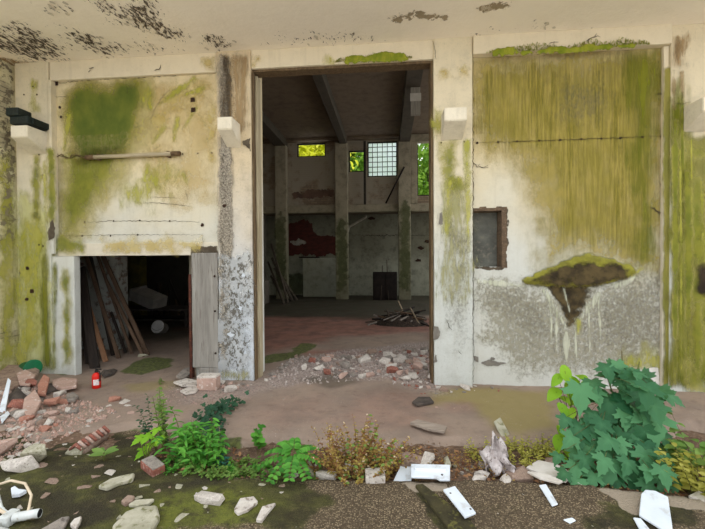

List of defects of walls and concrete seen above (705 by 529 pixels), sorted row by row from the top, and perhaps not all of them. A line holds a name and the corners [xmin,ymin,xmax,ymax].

leakage [64,55,248,200]
spalling [201,34,236,117]
leakage [17,195,52,367]
peeling [191,137,259,381]
peeling [288,219,336,257]
leakage [441,140,474,305]
leakage [479,53,705,387]